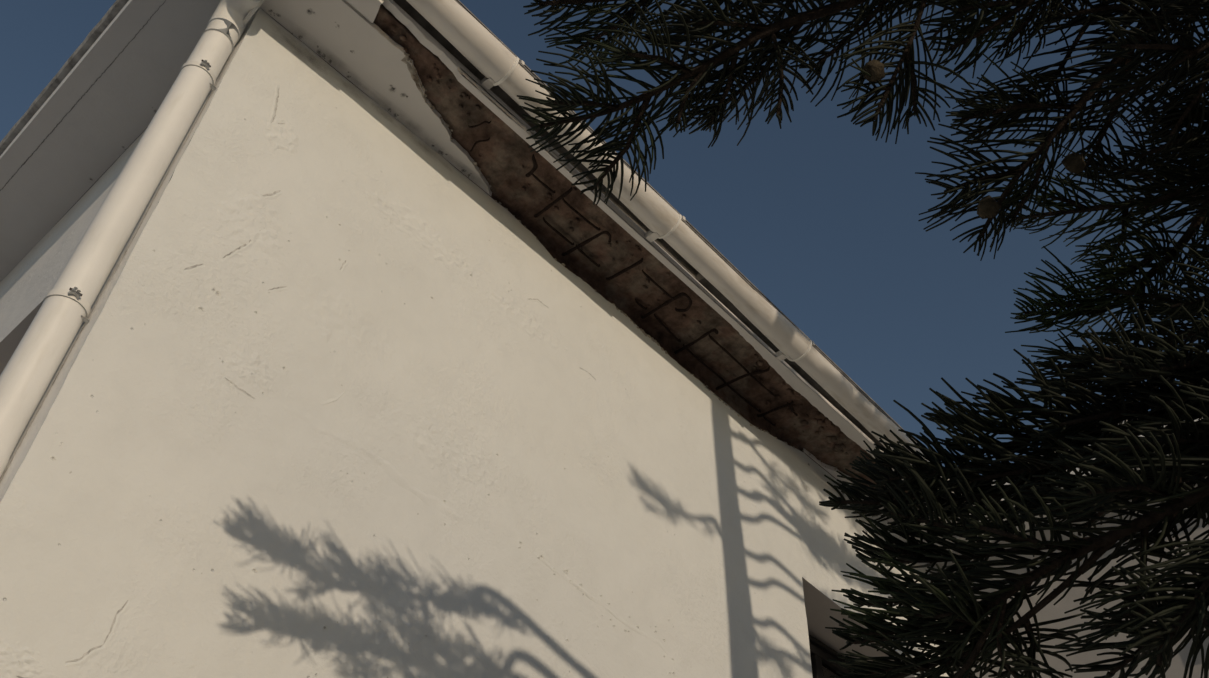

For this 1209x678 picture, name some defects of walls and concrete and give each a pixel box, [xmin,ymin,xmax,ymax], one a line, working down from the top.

spalling [373,5,876,500]
crack [65,600,131,668]